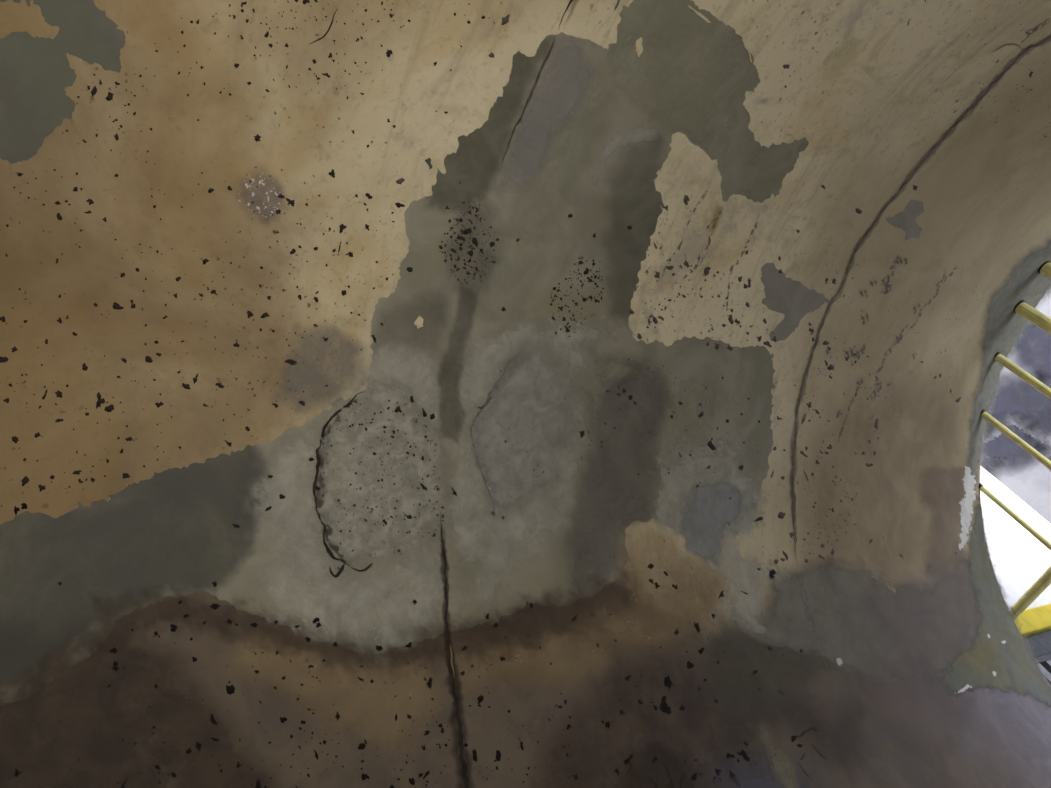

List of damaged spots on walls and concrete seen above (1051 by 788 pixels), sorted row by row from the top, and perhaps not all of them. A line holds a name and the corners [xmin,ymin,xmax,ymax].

peeling [0,0,129,163]
crack [510,0,573,141]
peeling [69,0,829,662]
crack [791,19,1051,674]
leakage [635,563,678,596]
leakage [757,551,788,580]
leakage [250,617,350,777]
leakage [358,739,378,781]
leakage [340,641,450,750]
crack [440,518,469,788]
leakage [464,728,524,780]
leakage [616,645,685,715]